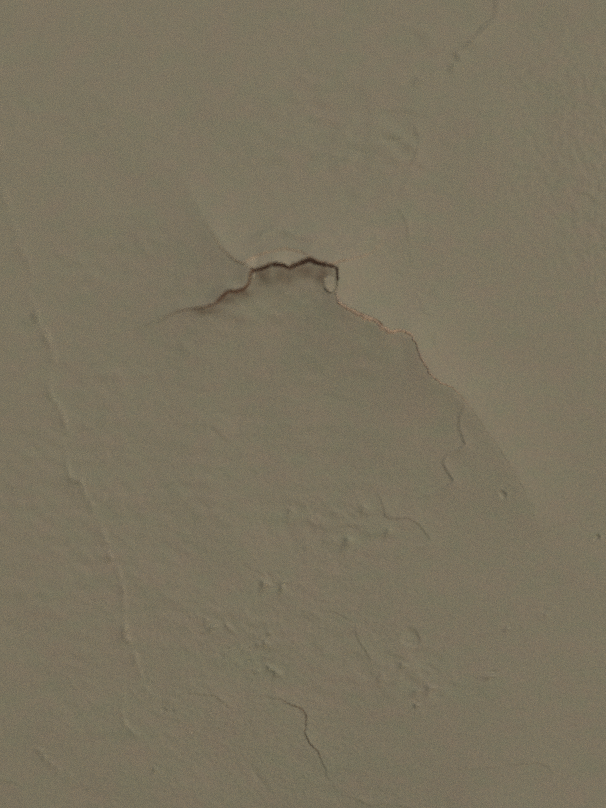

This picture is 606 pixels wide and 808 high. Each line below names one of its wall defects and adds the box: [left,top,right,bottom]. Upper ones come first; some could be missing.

peeling [102,158,549,552]